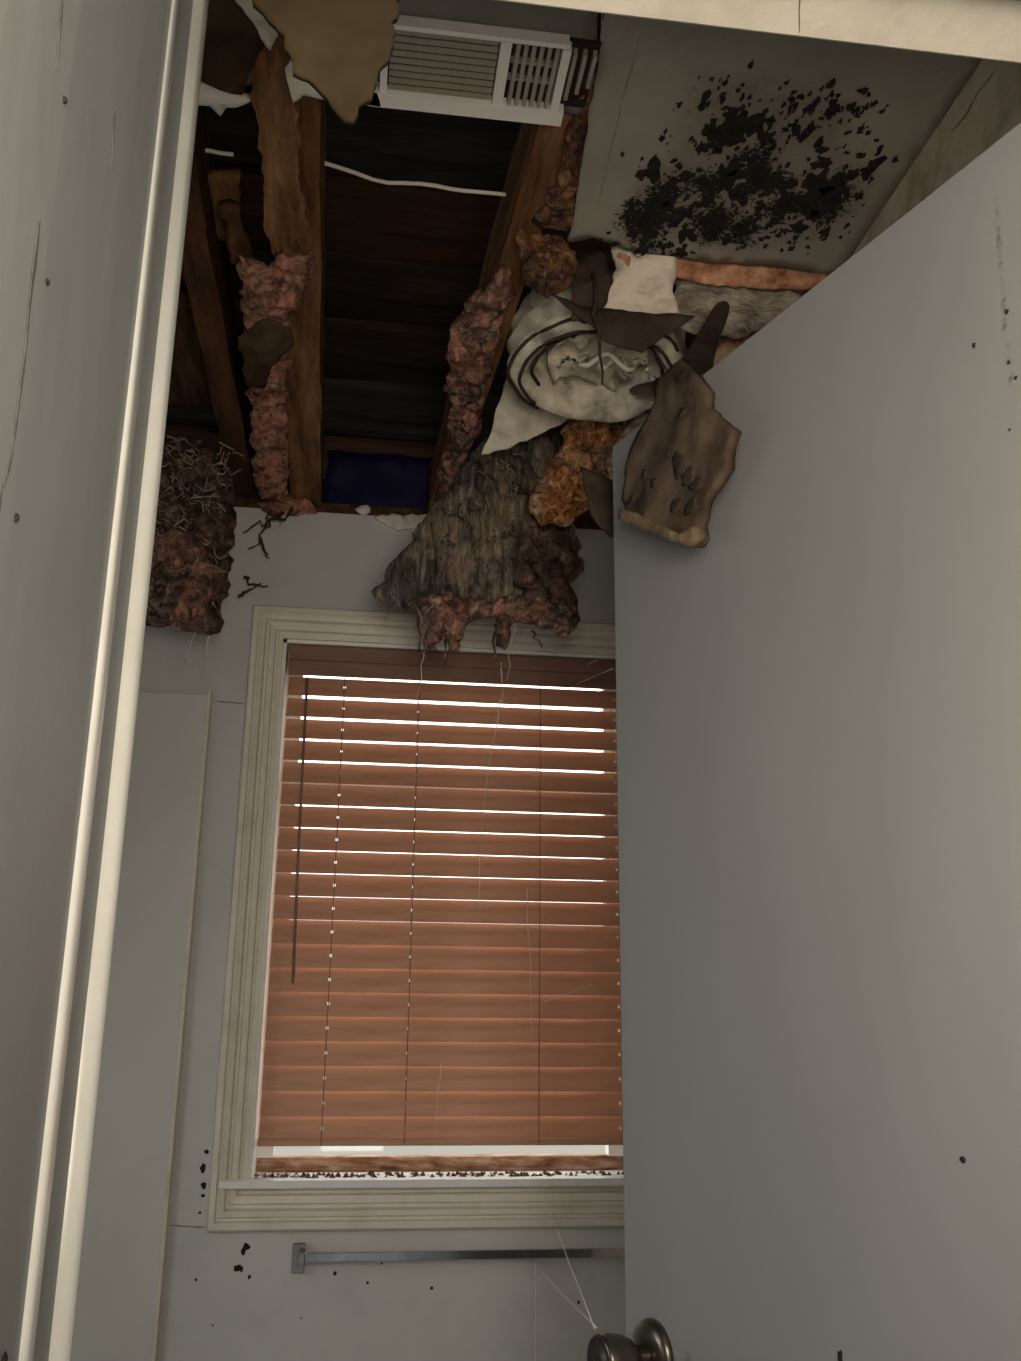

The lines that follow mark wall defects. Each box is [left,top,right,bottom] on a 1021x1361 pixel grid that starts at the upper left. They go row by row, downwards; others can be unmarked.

damp [598,59,899,260]
peeling [355,505,427,531]
spalling [618,509,707,548]